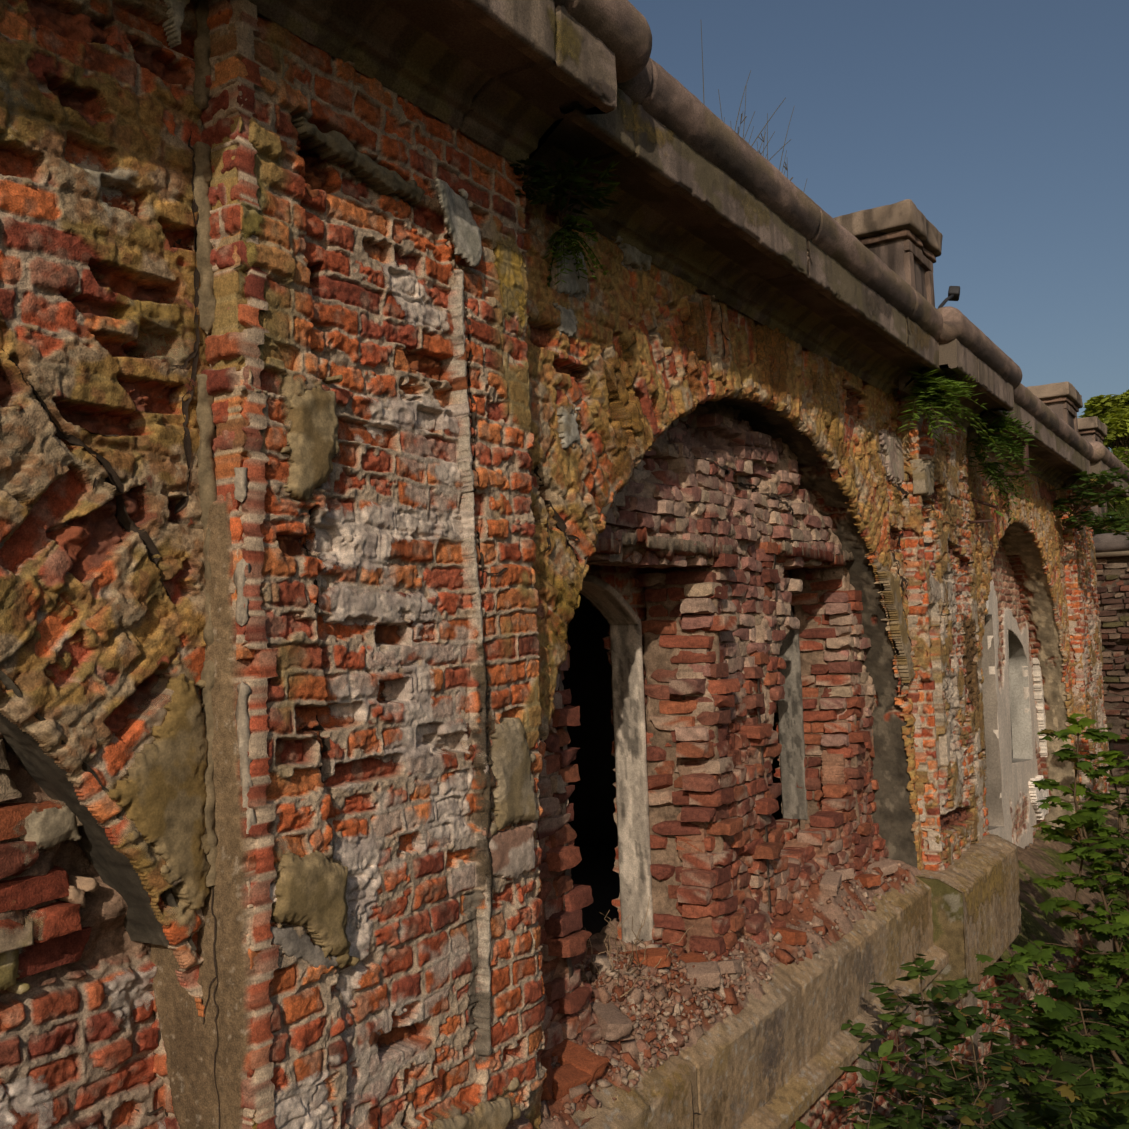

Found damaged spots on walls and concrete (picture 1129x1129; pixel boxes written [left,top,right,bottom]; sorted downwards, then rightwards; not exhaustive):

crack [173,131,200,514]
crack [1,348,171,600]
spalling [46,476,193,582]
peeling [276,500,475,576]
peeling [322,585,438,645]
leakage [592,337,650,517]
peeling [329,645,537,879]
leakage [103,967,157,1028]
crack [203,886,220,1129]
peeling [333,833,382,1014]
leakage [463,643,497,1064]
leakage [0,1076,56,1129]